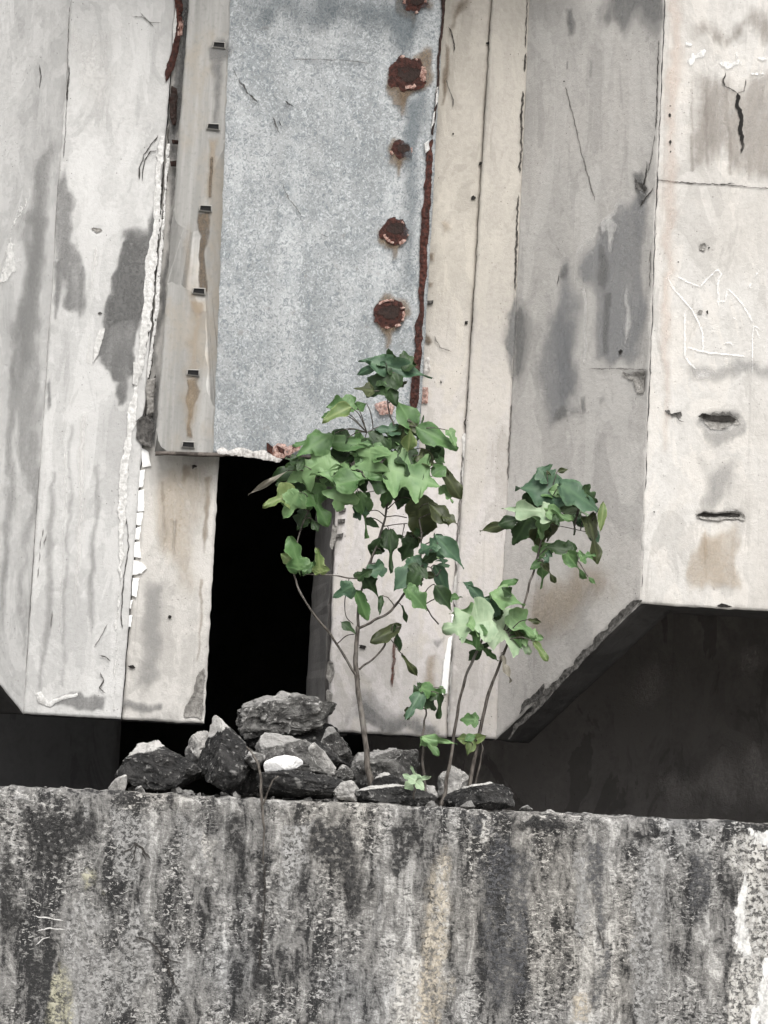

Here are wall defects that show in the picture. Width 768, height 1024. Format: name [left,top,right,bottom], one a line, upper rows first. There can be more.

crack [647,41,768,189]
rust [373,0,462,408]
peeling [93,328,105,363]
water stain [98,217,154,403]
peeling [114,135,170,687]
rust [374,401,394,415]
spalling [698,412,740,430]
spalling [696,510,745,521]
water stain [48,900,153,1024]
water stain [279,818,382,922]
water stain [391,856,450,1024]
efflorescence [725,828,768,1024]